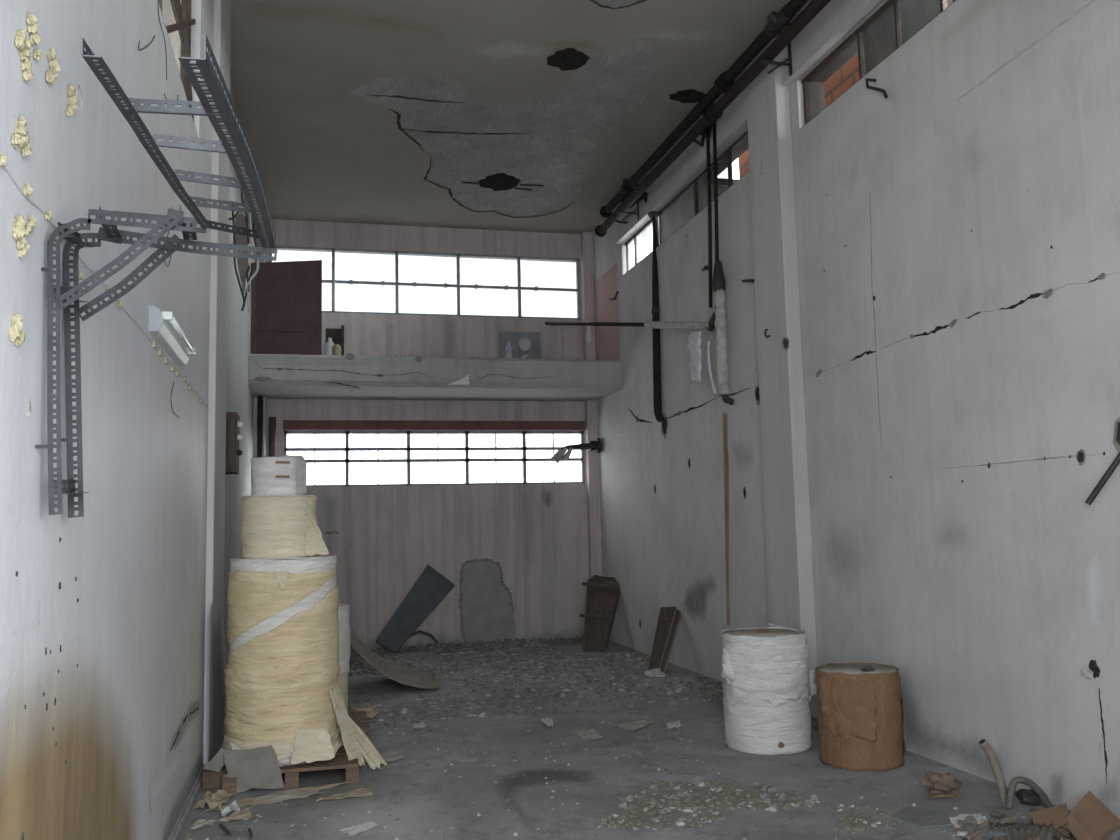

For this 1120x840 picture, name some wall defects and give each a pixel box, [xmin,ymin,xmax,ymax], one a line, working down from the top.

spalling [547,48,590,71]
spalling [462,173,544,191]
crack [813,198,1120,450]
crack [607,388,750,435]
crack [937,455,1091,469]
crack [1099,690,1108,784]